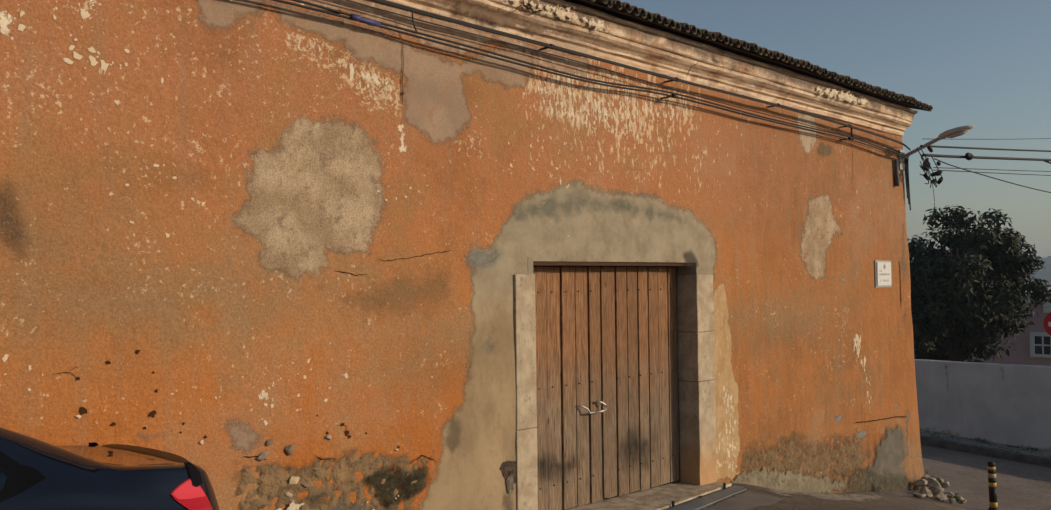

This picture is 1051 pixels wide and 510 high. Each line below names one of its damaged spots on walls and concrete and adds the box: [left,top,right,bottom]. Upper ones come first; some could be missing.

peeling [0,4,26,40]
peeling [63,0,130,72]
peeling [397,124,407,153]
peeling [523,68,694,141]
crack [338,250,452,276]
peeling [250,358,312,426]
peeling [713,283,872,481]
spalling [237,439,428,510]
spalling [499,461,516,494]